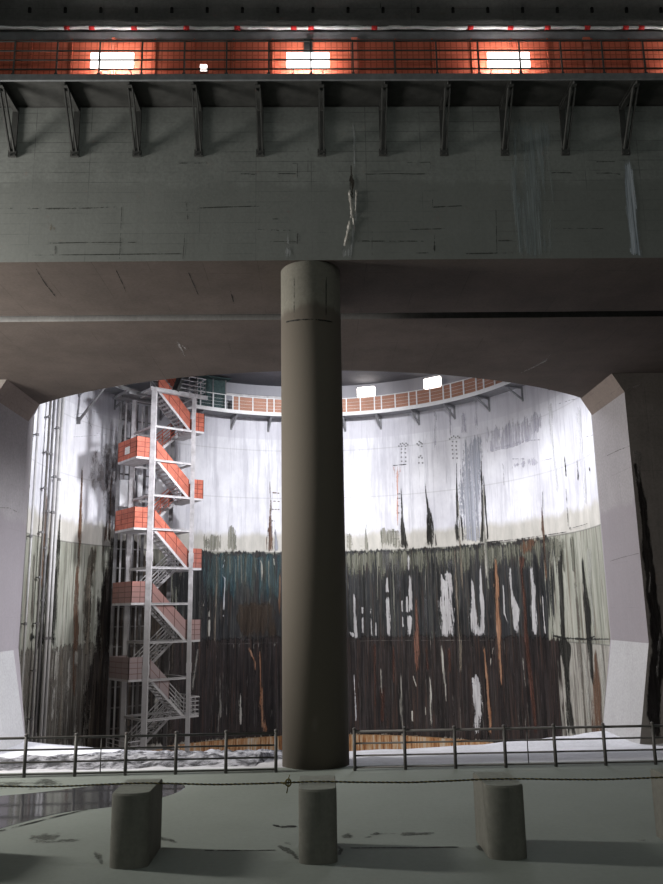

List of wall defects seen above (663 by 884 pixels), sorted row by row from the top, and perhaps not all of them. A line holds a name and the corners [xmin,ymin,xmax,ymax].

water stain [625,162,642,255]
water stain [347,525,368,566]
water stain [350,528,426,641]
water stain [438,435,491,671]
water stain [503,557,553,635]
water stain [570,536,590,733]
rust [249,648,267,732]
water stain [472,674,483,734]
rust [483,646,492,733]